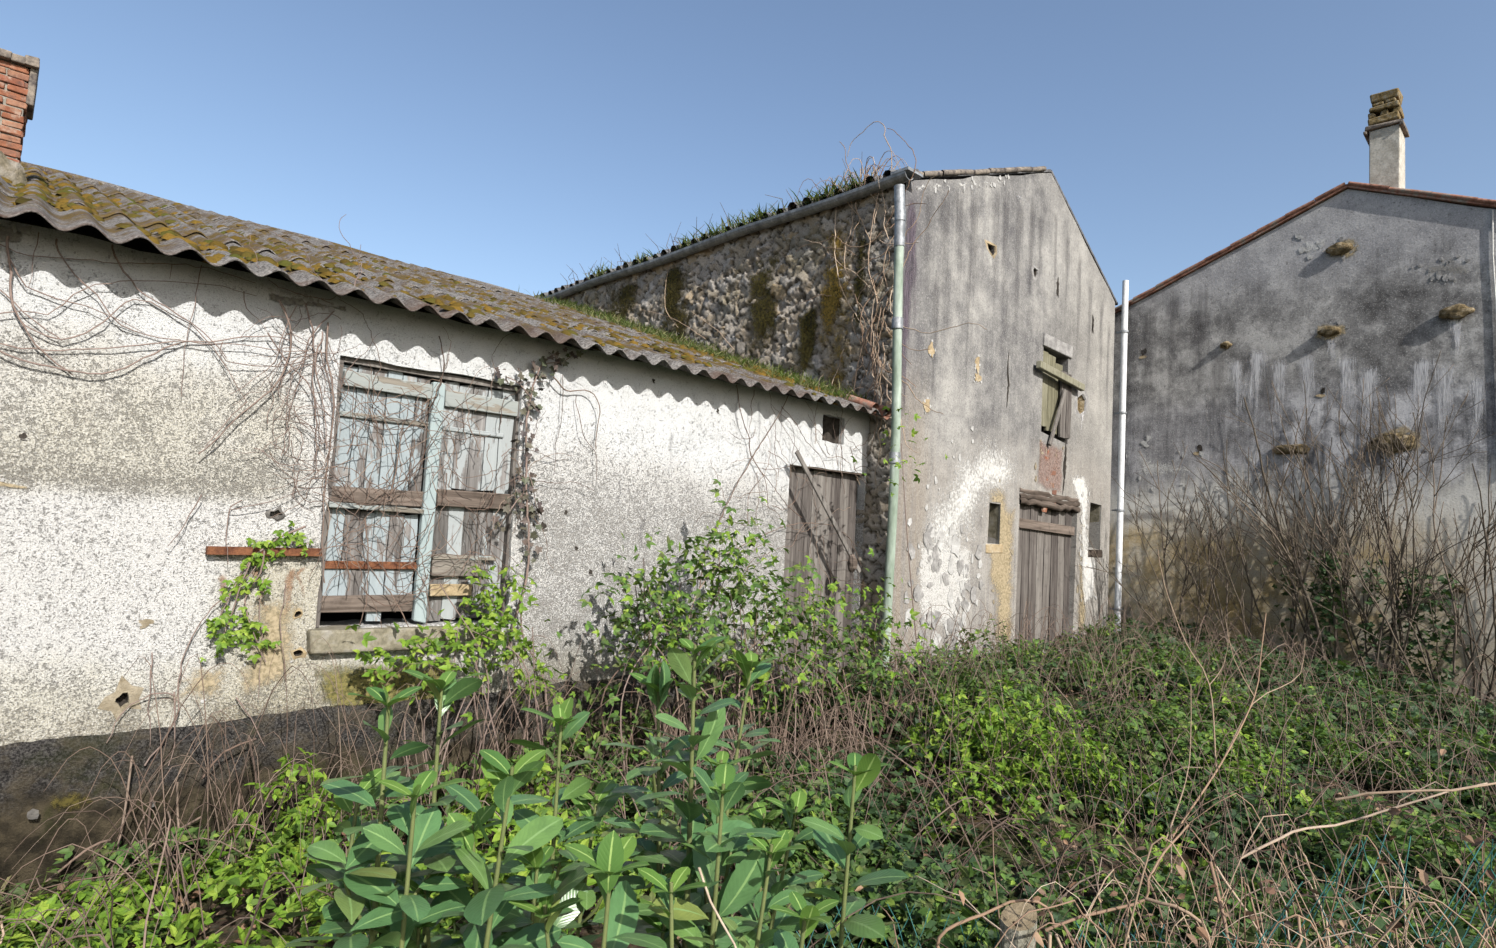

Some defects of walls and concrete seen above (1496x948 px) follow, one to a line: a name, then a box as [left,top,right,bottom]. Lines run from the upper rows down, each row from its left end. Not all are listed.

water stain [1232,351,1314,423]
water stain [1327,338,1376,429]
water stain [1414,360,1484,431]
peeling [904,426,1015,650]
peeling [1034,439,1097,627]
spalling [97,676,144,722]